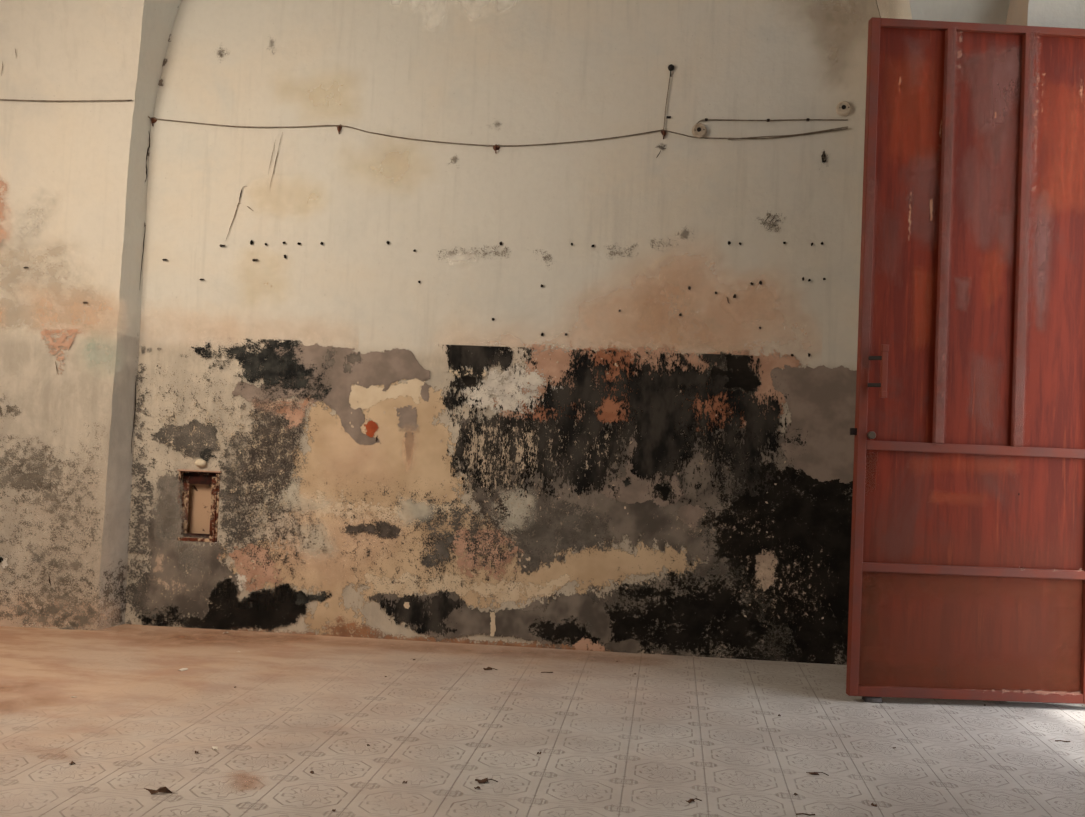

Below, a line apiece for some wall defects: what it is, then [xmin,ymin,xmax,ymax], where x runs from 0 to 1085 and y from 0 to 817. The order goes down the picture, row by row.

peeling [438,246,511,260]
damp [449,361,562,418]
damp [0,338,332,630]
flaking render [137,339,831,653]
damp [496,494,533,526]